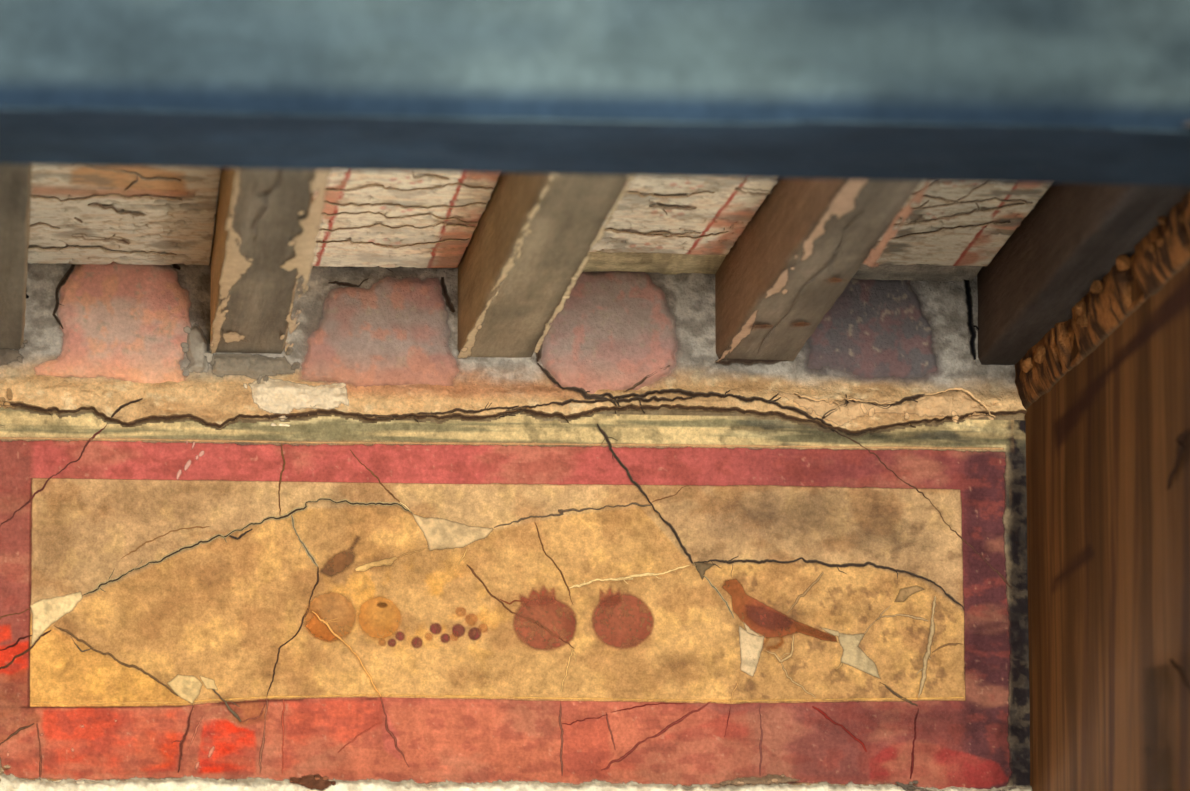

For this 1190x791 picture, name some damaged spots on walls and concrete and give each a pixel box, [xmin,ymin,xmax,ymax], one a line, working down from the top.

crack [26,165,182,329]
spalling [181,168,349,426]
crack [253,169,284,243]
crack [312,171,493,287]
crack [599,187,773,239]
peeling [718,310,758,362]
peeling [765,180,868,298]
peeling [863,182,930,268]
crack [878,181,1033,243]
crack [0,212,1027,780]